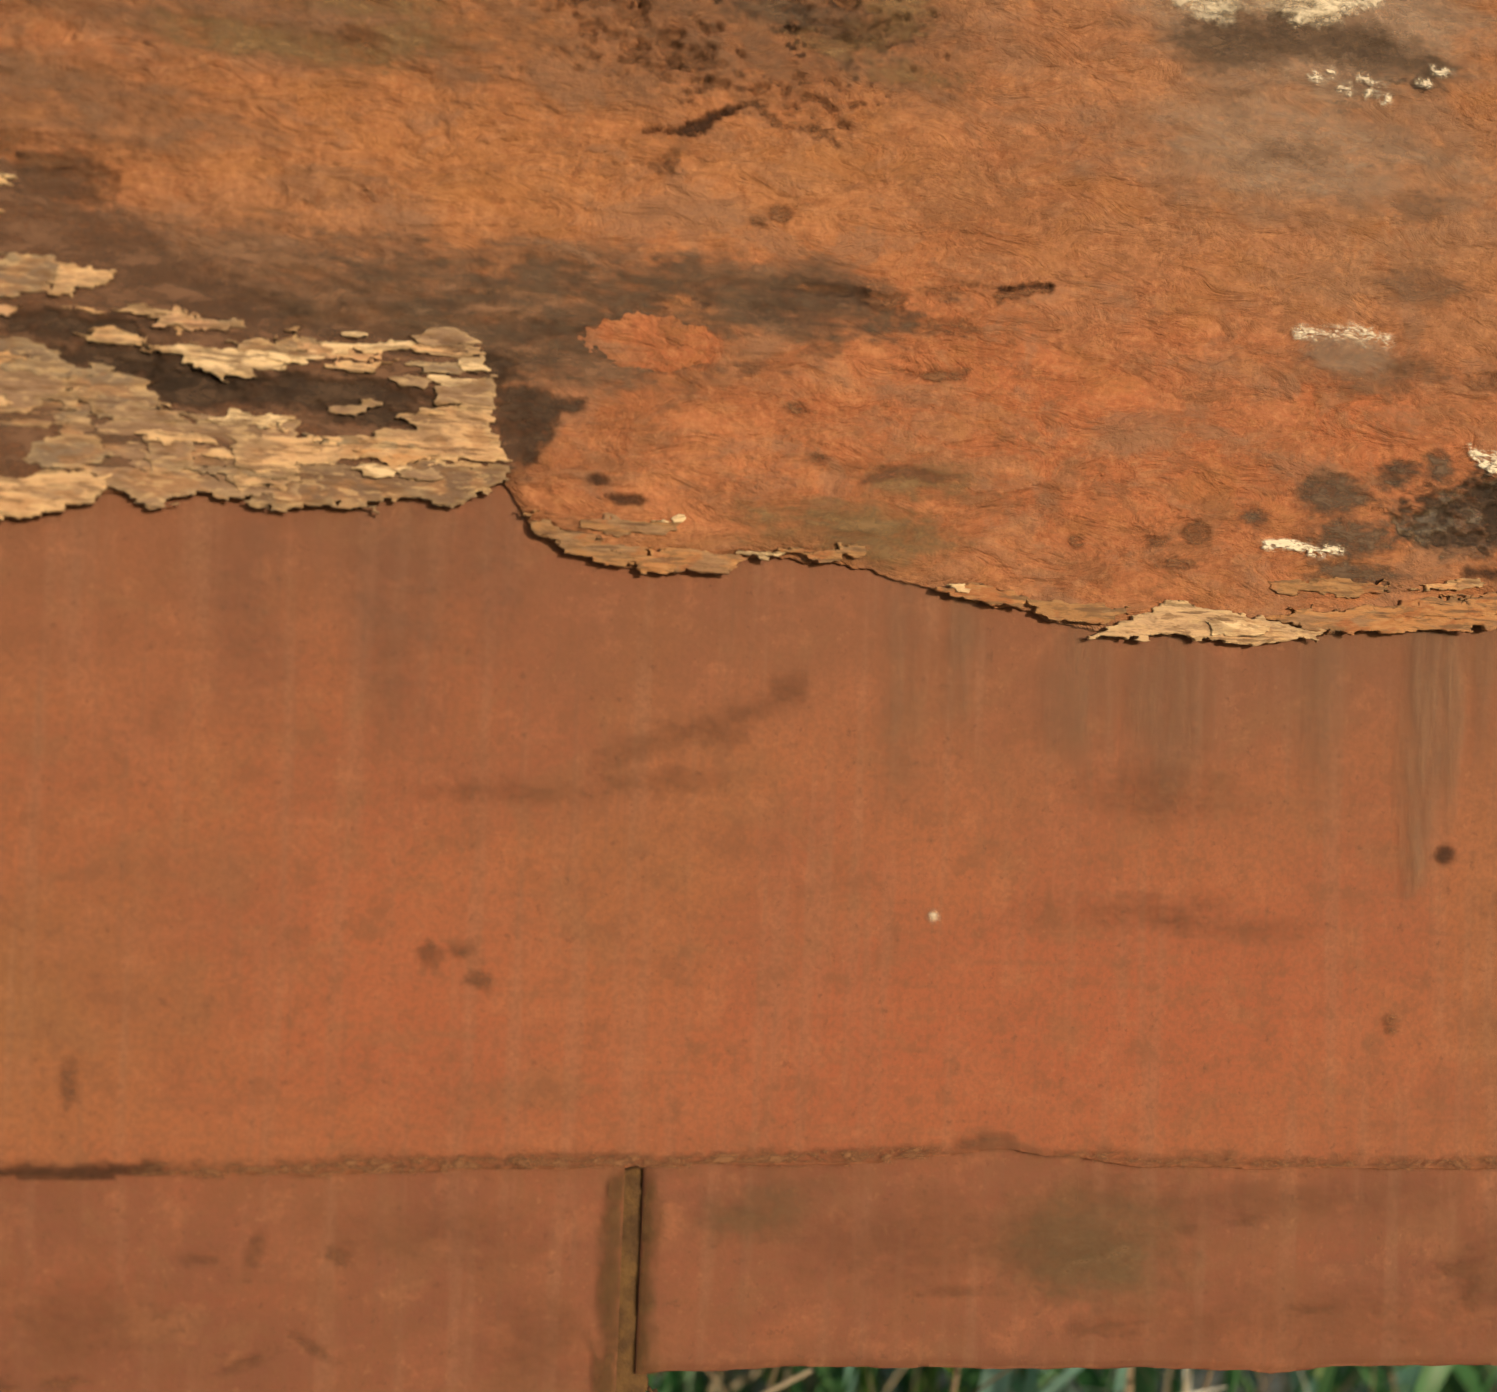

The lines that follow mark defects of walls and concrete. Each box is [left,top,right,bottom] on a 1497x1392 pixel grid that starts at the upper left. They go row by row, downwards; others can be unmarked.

leakage [1140,0,1472,95]
peeling [0,172,17,185]
leakage [1172,107,1445,195]
leakage [0,136,919,490]
peeling [0,252,516,520]
peeling [518,474,867,575]
peeling [935,577,1497,647]
corrosion [1465,568,1497,579]
corrosion [1438,847,1454,863]